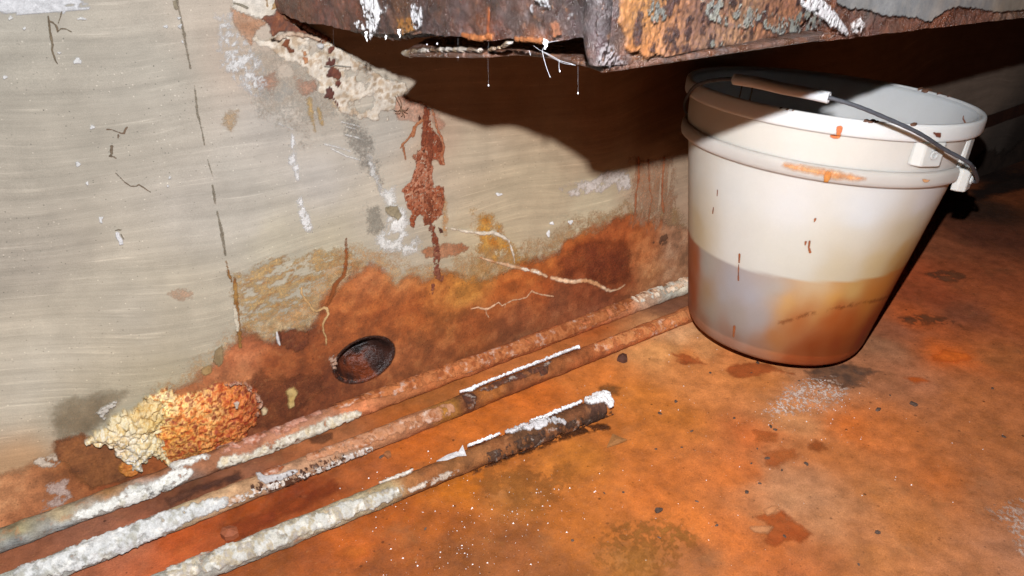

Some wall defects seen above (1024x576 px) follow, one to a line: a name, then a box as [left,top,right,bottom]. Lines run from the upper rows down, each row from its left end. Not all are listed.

spalling [253,31,408,121]
crack [173,0,242,348]
corrosion [154,95,688,437]
crack [446,227,625,317]
spalling [332,336,395,384]
corrosion [673,354,702,365]
corrosion [727,363,782,378]
corrosion [0,456,168,527]
corrosion [169,472,242,505]
spalling [251,454,345,492]
corrosion [311,433,332,443]
corrosion [475,424,610,507]